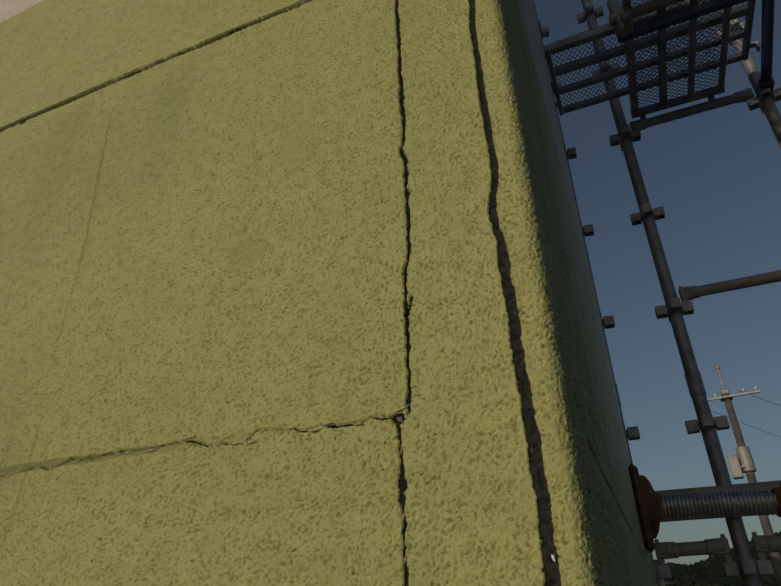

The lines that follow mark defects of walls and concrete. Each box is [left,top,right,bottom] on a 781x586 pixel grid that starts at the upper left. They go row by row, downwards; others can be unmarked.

crack [123,0,413,586]
crack [469,0,562,586]